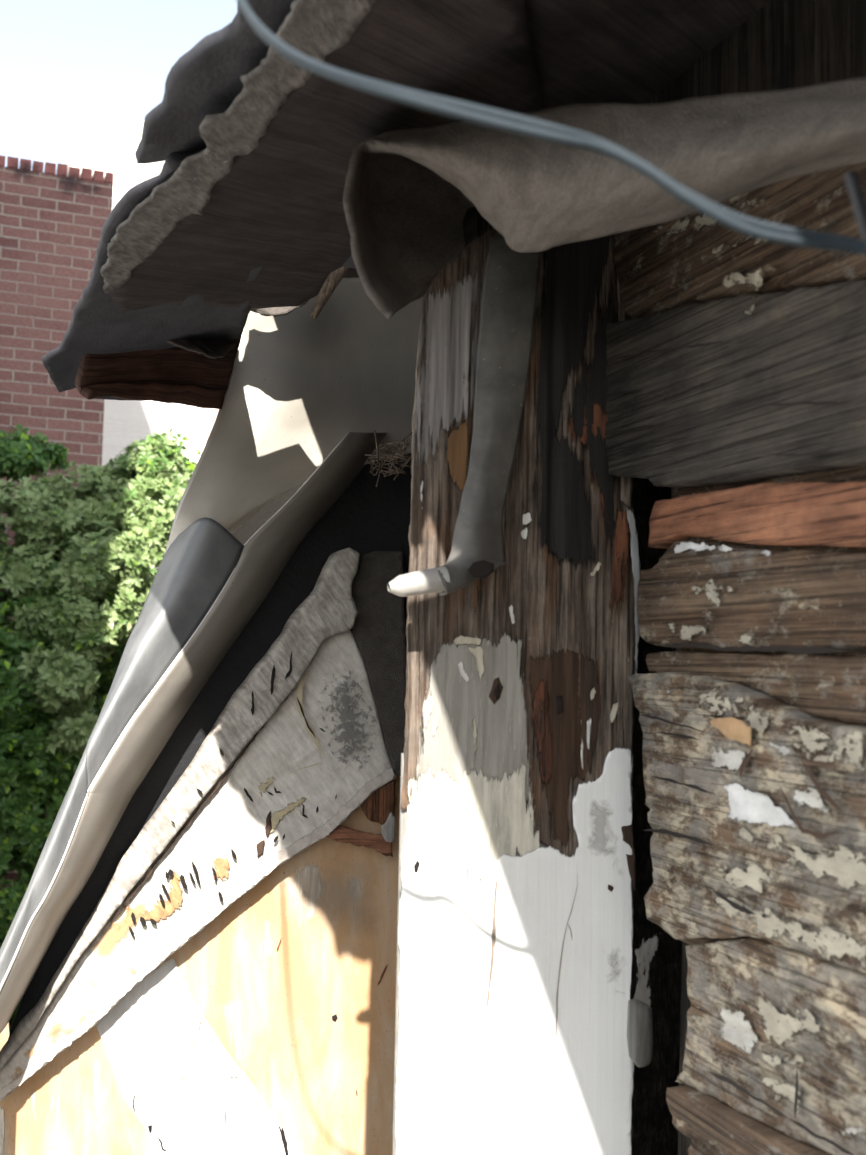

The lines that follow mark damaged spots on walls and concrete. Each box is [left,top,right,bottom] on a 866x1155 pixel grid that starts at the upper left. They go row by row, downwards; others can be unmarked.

peeling [722,268,764,315]
peeling [413,268,485,491]
peeling [674,542,732,553]
peeling [668,579,733,641]
peeling [416,605,618,850]
peeling [123,871,183,922]
peeling [256,797,307,857]
crack [486,863,499,1021]
peeling [621,825,636,890]
peeling [697,688,866,967]
crack [554,889,577,1155]
peeling [692,995,822,1114]